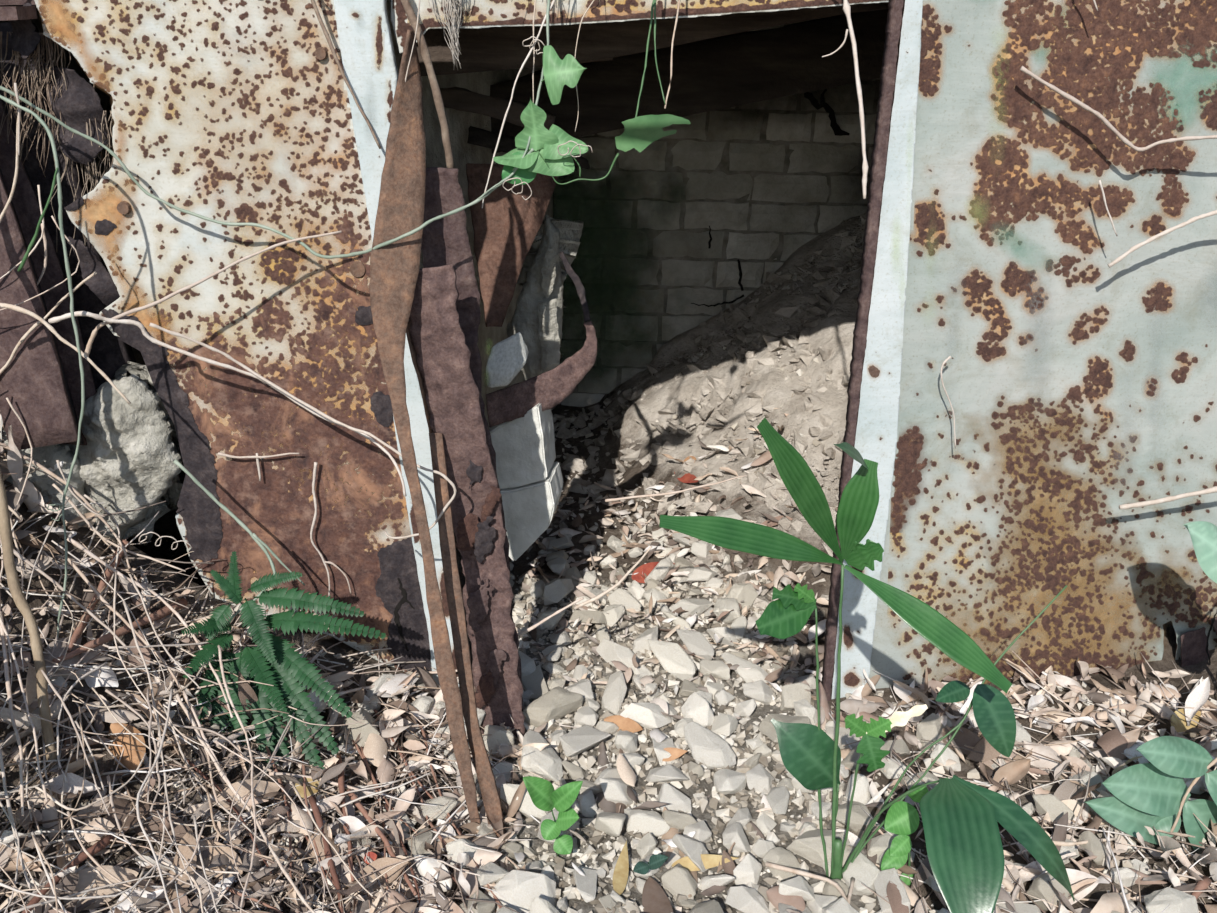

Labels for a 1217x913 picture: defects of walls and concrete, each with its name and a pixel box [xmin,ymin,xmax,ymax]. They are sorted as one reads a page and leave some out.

corrosion [34,0,884,838]
crack [691,260,744,307]
crack [804,89,850,136]
corrosion [907,0,1217,362]